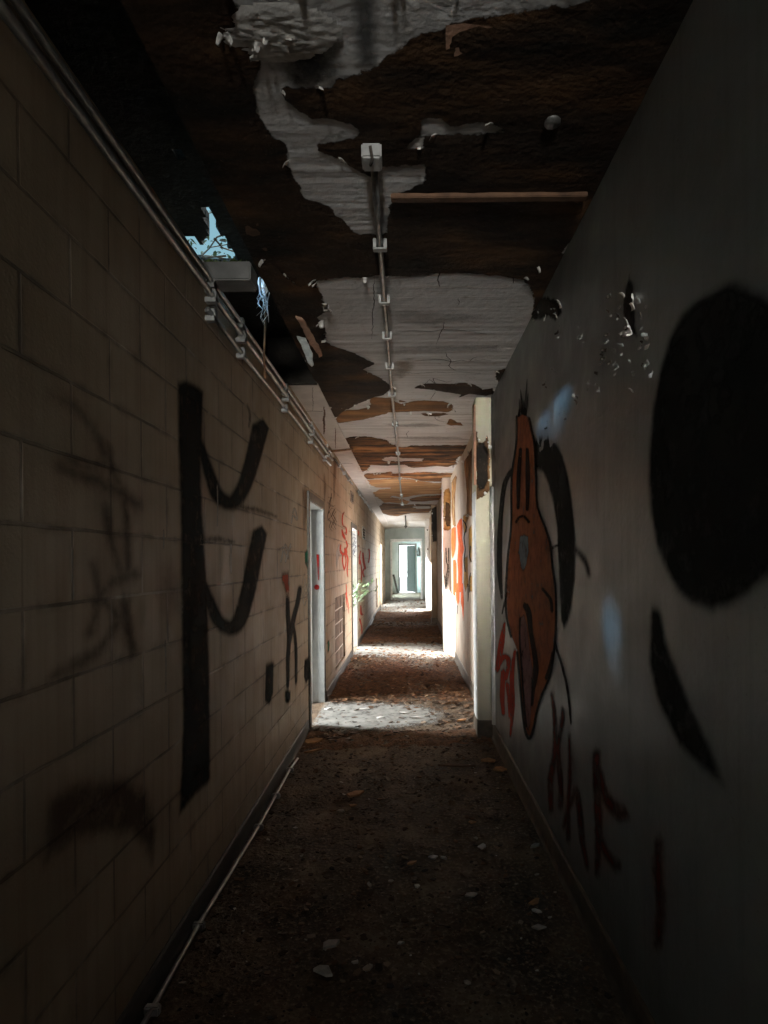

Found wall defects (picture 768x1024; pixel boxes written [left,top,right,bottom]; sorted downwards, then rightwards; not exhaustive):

peeling [121,0,693,427]
peeling [345,432,492,542]